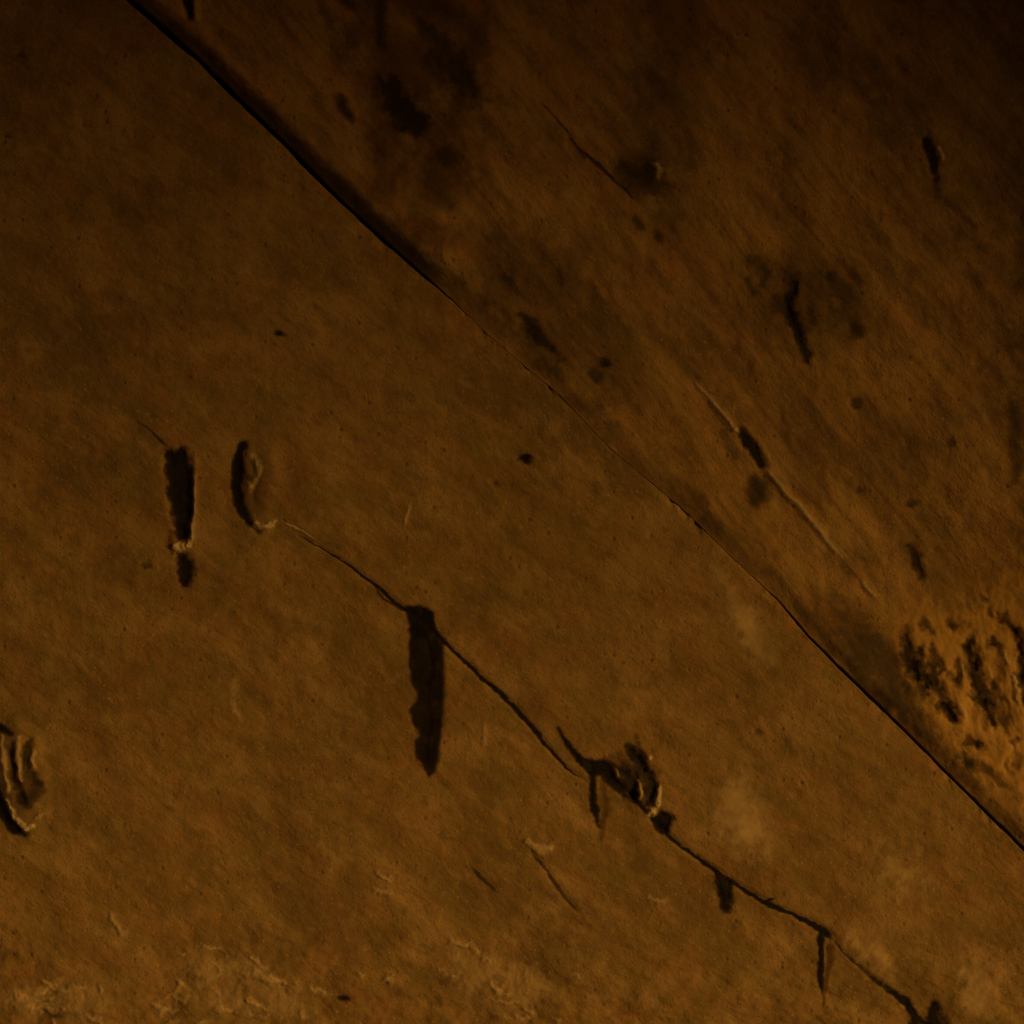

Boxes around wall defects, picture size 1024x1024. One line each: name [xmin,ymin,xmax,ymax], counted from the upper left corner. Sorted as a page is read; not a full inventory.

crack [542,103,660,239]
spalling [165,447,196,587]
crack [301,536,408,612]
crack [437,631,581,778]
peeling [900,573,1024,809]
spalling [558,727,672,840]